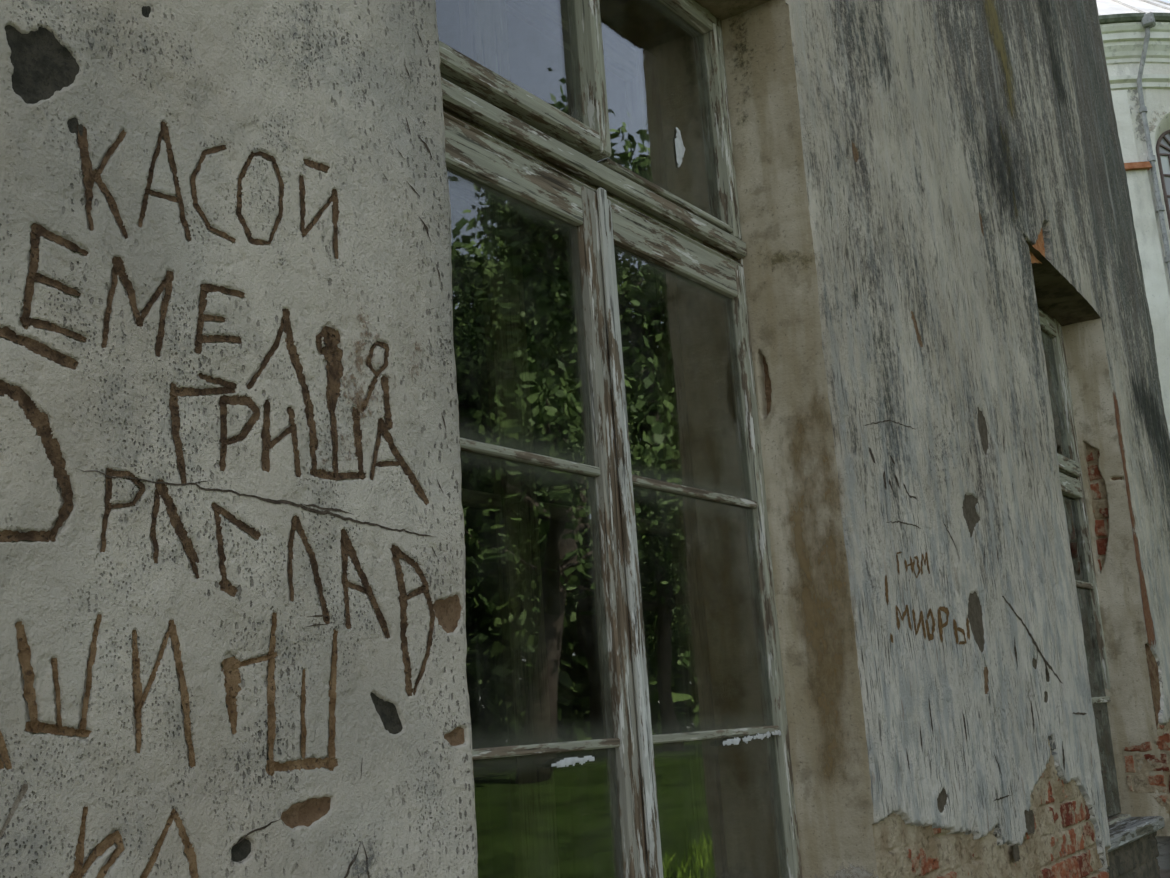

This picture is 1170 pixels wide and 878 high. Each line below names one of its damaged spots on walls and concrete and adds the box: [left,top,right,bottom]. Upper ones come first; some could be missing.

spalling [4,25,80,104]
damp [1036,0,1072,112]
damp [971,0,1034,235]
damp [1130,373,1170,484]
crack [79,469,437,557]
damp [788,398,846,779]
crack [1002,596,1062,683]
spalling [370,692,403,734]
crack [906,700,933,770]
crack [963,714,1011,801]
spalling [281,797,331,829]
flaking render [869,738,1161,878]